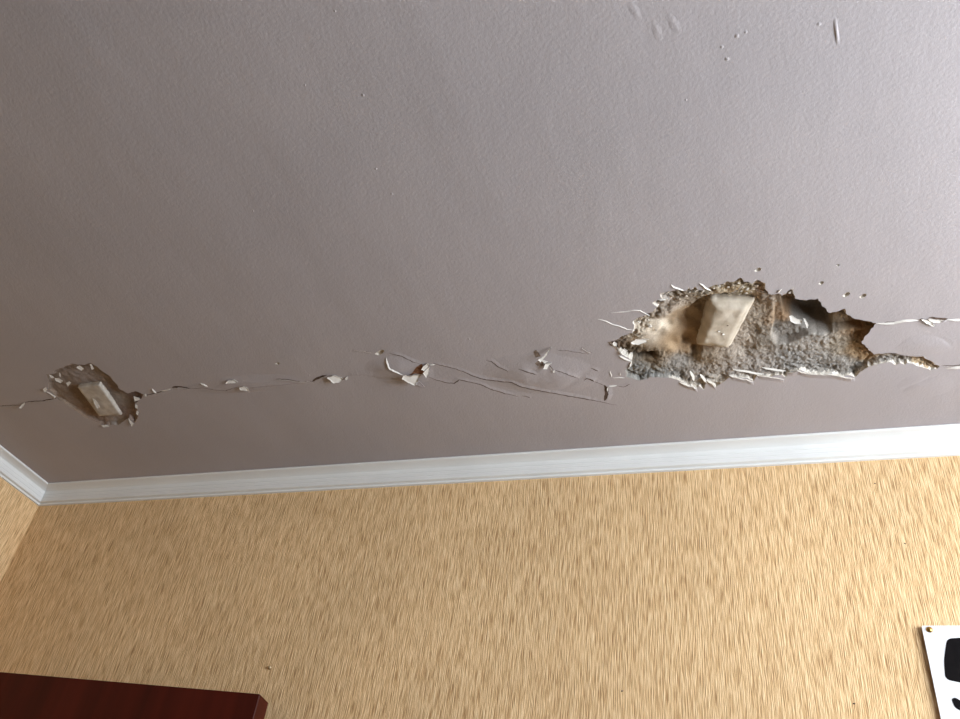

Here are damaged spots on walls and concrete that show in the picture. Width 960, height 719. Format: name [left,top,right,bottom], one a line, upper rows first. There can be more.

spalling [599,268,940,392]
crack [876,317,960,326]
crack [0,398,59,408]
spalling [43,363,146,427]
crack [144,379,313,398]
peeling [402,363,435,387]
crack [346,347,631,406]
peeling [534,349,555,373]
crack [940,363,960,371]